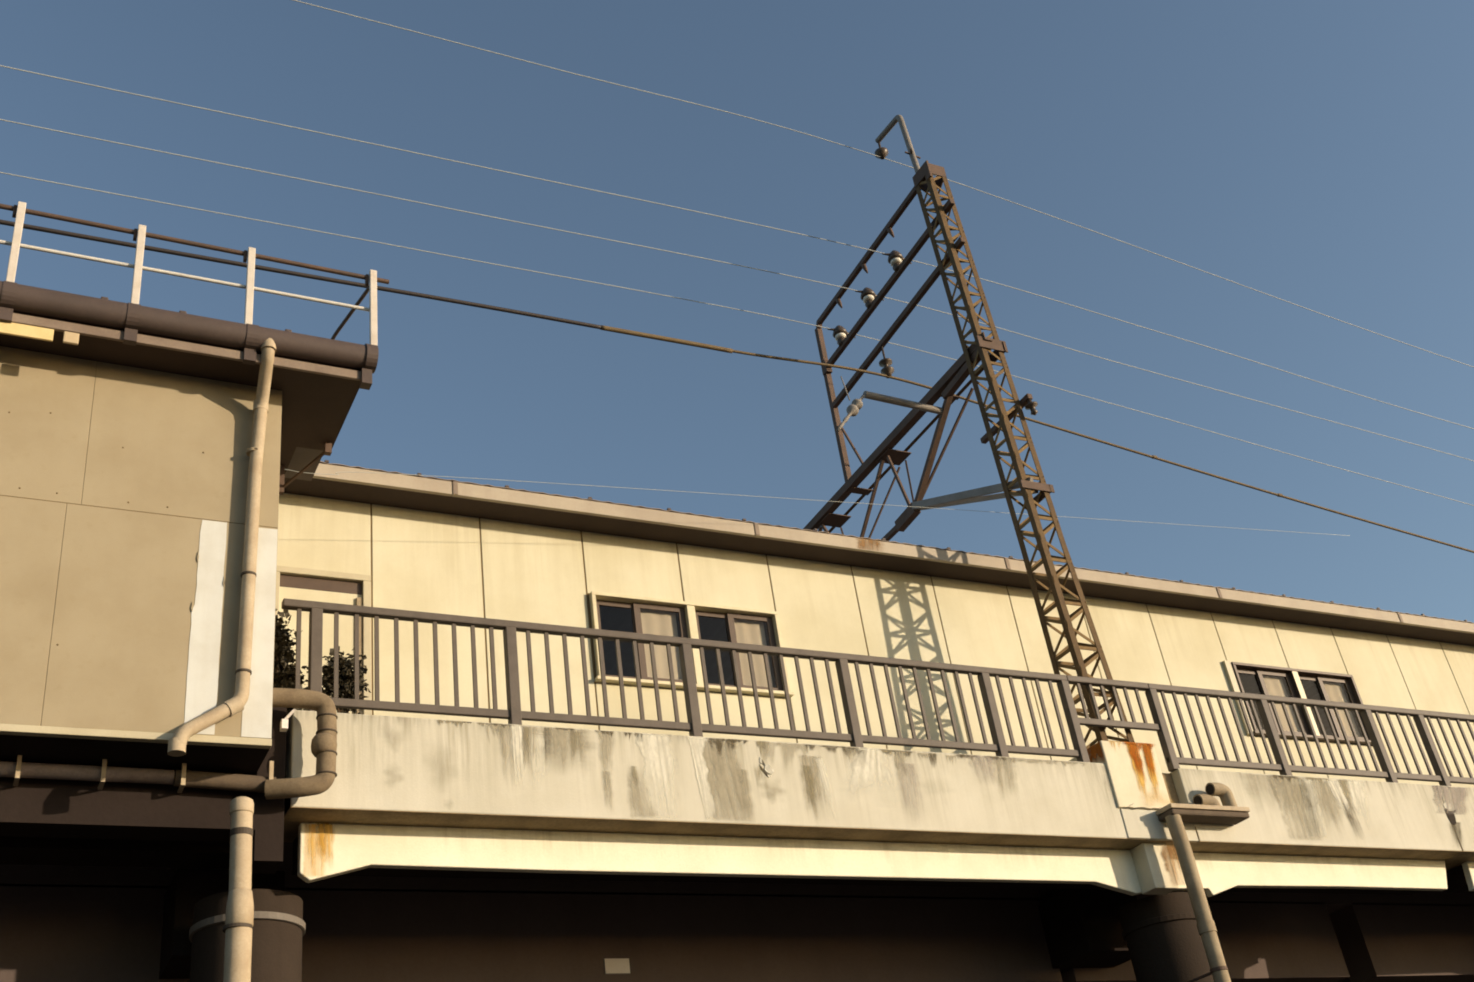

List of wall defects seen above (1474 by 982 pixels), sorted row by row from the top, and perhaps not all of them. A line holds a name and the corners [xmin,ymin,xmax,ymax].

damp [438,720,673,815]
damp [690,738,1083,819]
corrosion [1087,742,1158,792]
damp [1270,775,1365,837]
damp [1433,786,1466,839]
corrosion [308,823,333,865]